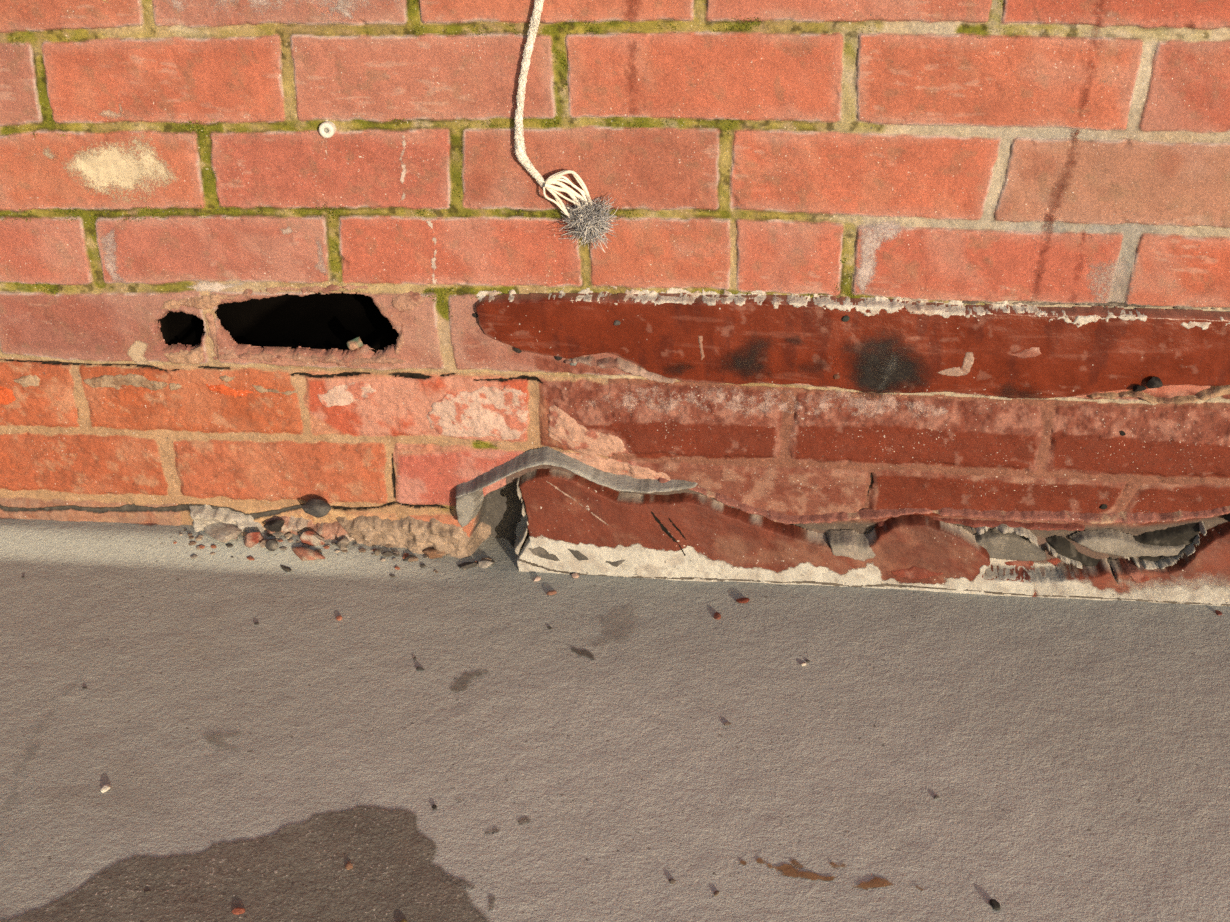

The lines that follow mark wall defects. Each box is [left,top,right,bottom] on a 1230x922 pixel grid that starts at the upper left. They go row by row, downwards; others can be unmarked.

spalling [158,284,426,367]
spalling [0,375,40,405]
spalling [84,373,182,391]
spalling [205,375,298,398]
spalling [317,382,377,407]
spalling [554,355,677,384]
spalling [1088,385,1230,405]
spalling [427,385,529,441]
spalling [547,405,671,481]
peeling [514,515,1230,615]
leakage [1,806,495,922]